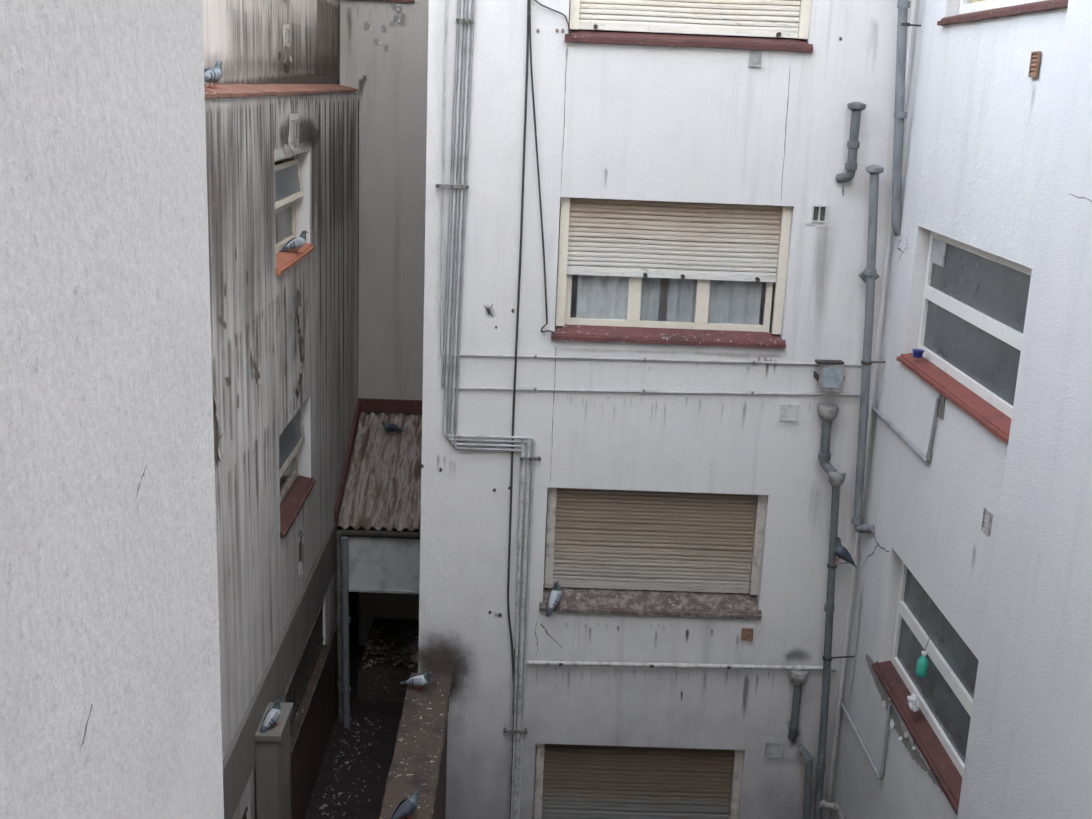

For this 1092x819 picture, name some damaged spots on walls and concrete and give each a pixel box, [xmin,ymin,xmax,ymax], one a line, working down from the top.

water stain [205,1,367,357]
peeling [212,377,239,464]
water stain [415,644,461,695]